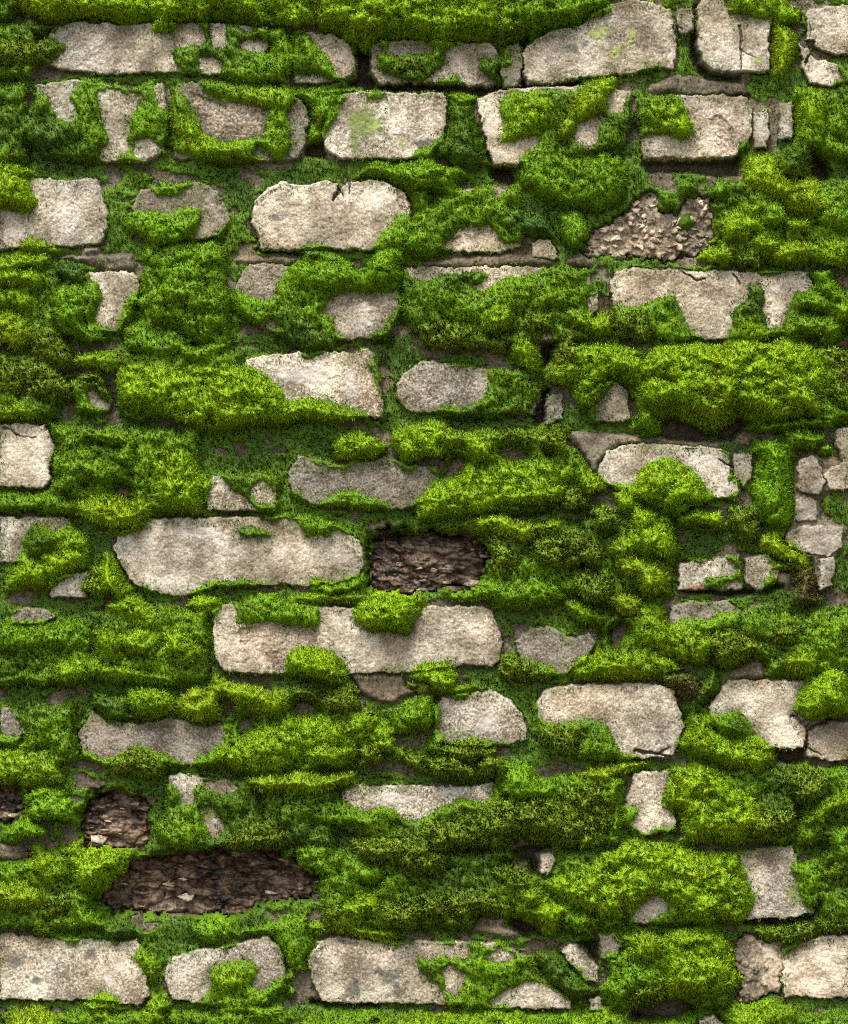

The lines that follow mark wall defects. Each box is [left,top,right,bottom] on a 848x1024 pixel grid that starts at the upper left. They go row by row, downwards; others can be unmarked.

crack [332,181,351,202]